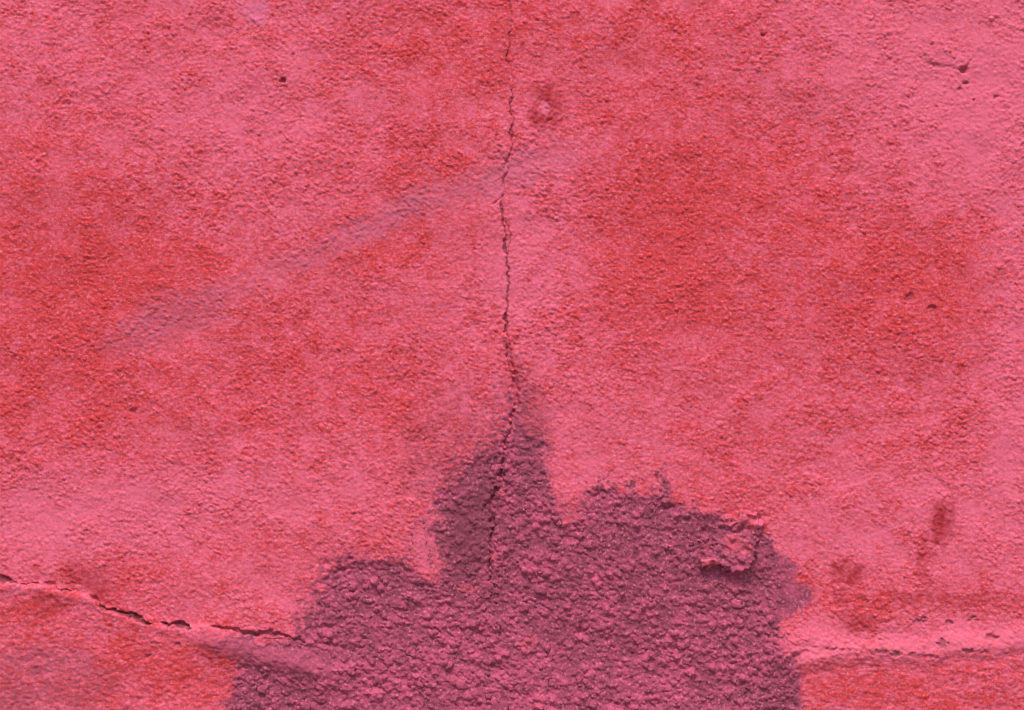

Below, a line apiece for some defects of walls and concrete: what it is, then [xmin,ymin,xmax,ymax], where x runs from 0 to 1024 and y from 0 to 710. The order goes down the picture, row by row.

crack [505,0,515,140]
crack [493,203,512,332]
water stain [367,321,572,607]
crack [0,574,74,593]
crack [94,604,305,644]